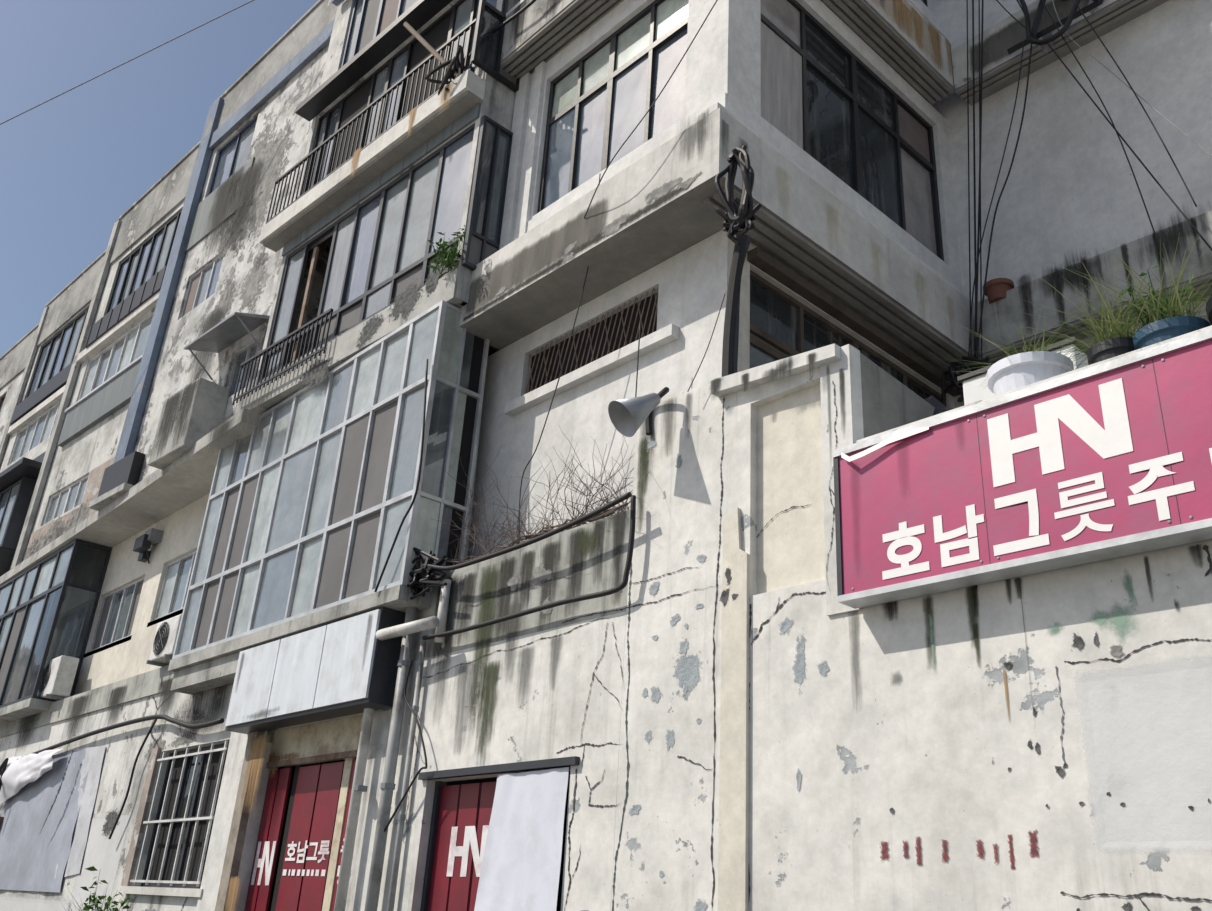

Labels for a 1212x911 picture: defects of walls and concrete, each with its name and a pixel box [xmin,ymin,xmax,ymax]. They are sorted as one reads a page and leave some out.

corrosion [894,0,951,68]
water stain [157,351,210,454]
water stain [433,395,690,752]
crack [403,398,725,911]
peeling [670,614,701,696]
spalling [719,568,738,606]
crack [749,381,837,710]
peeling [780,618,829,692]
water stain [967,585,979,664]
spalling [1072,633,1124,658]
crack [1055,638,1210,770]
crack [1060,891,1212,911]